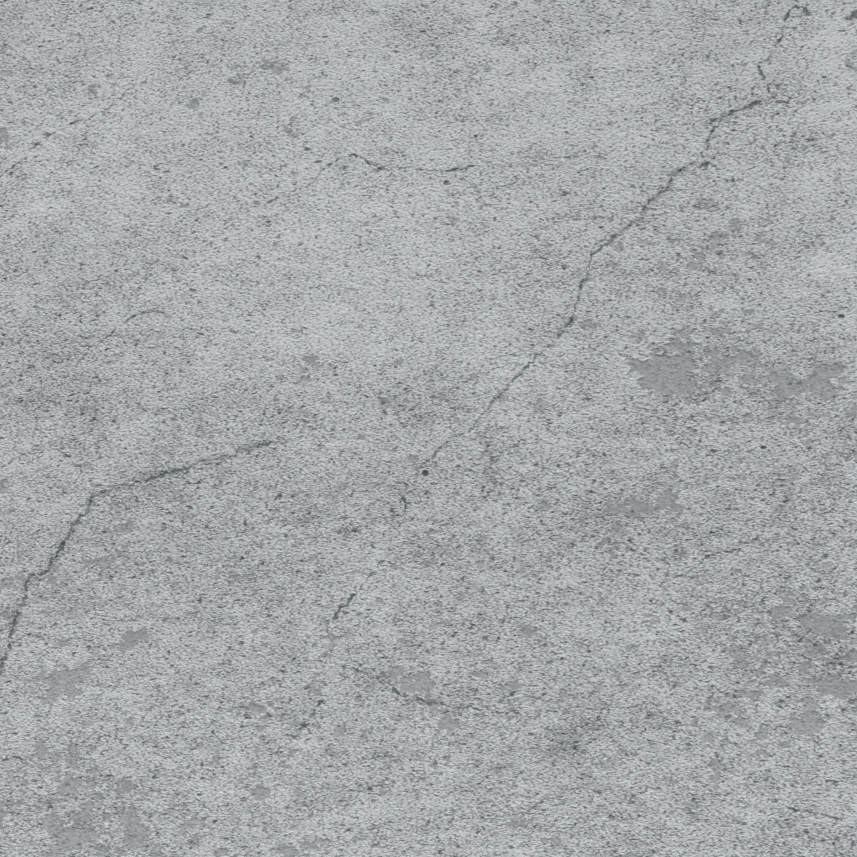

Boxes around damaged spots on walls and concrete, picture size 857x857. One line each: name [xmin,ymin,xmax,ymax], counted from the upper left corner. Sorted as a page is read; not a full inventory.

crack [777,5,807,43]
crack [327,154,421,176]
crack [644,62,782,211]
crack [474,241,613,426]
peeling [625,327,847,406]
crack [0,450,187,668]
crack [333,560,384,620]